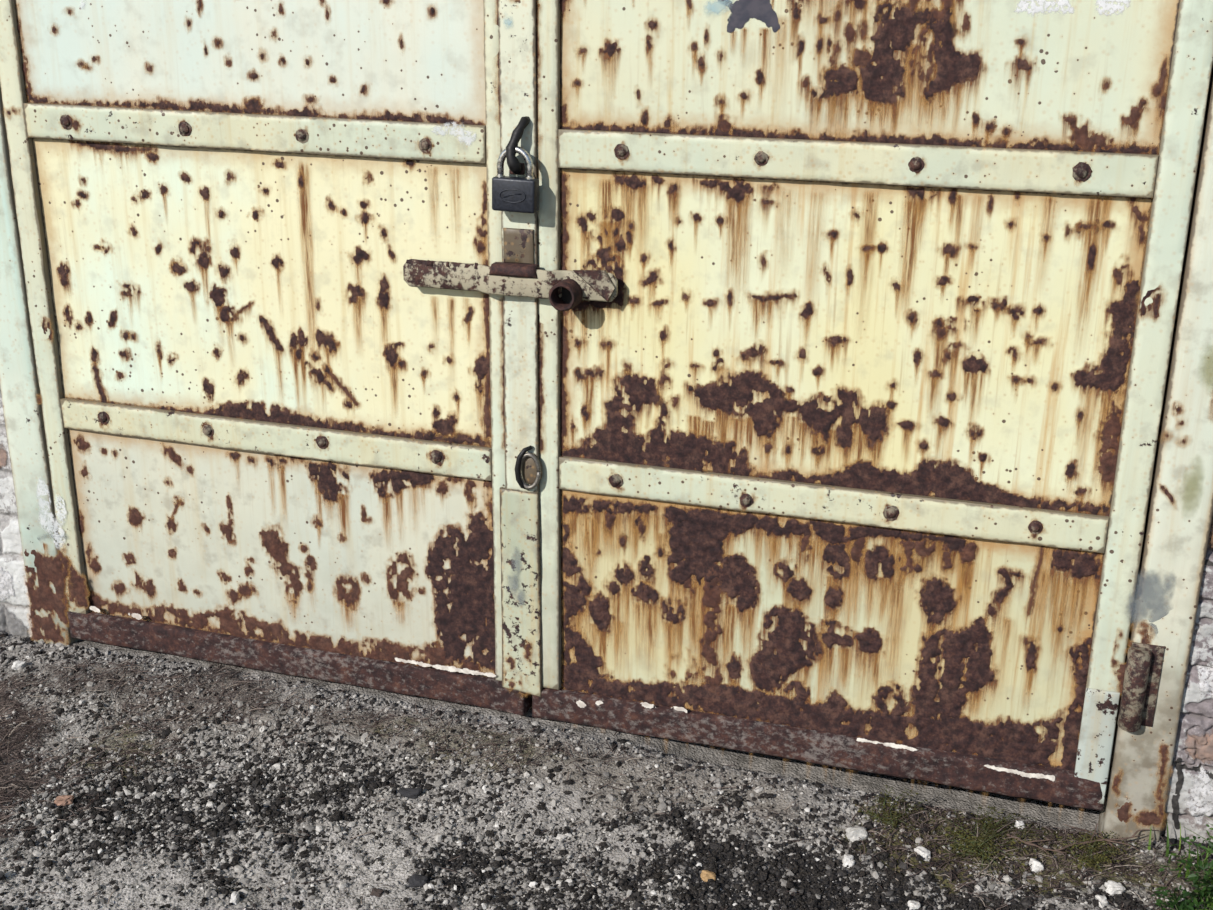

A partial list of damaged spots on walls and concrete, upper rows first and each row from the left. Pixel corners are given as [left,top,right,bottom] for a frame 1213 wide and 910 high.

rust [787,0,987,125]
rust [56,262,70,291]
rust [92,363,109,403]
rust [163,445,182,467]
rust [259,164,359,407]
rust [347,246,404,400]
rust [432,406,458,438]
rust [473,181,488,266]
rust [473,293,491,439]
rust [560,172,1141,771]
rust [24,450,532,689]
rust [1111,622,1152,694]